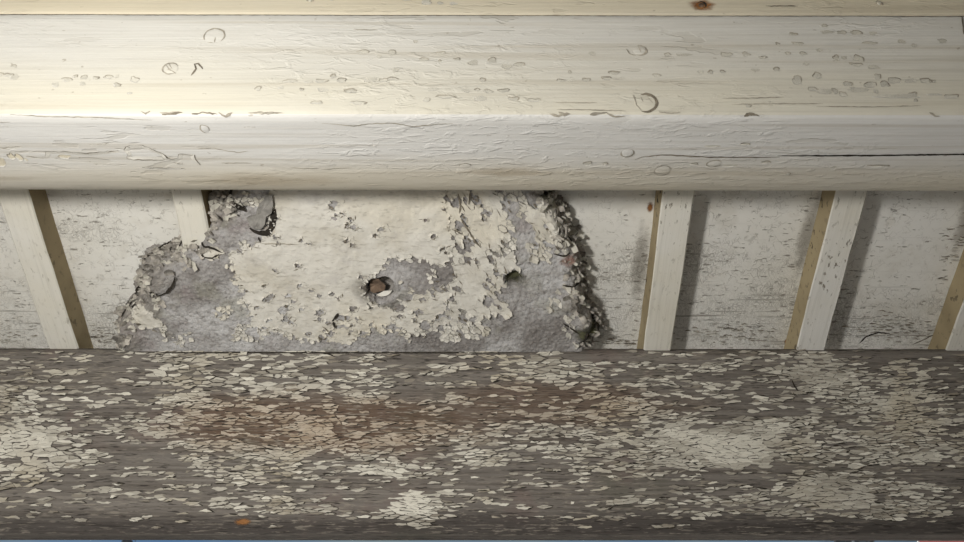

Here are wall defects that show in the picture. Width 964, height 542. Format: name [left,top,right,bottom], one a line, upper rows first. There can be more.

crack [0,14,256,43]
crack [303,15,676,30]
crack [877,16,964,34]
crack [626,45,647,56]
crack [162,62,203,75]
crack [555,93,658,113]
crack [725,97,917,107]
crack [2,114,140,123]
crack [323,121,453,129]
crack [199,125,246,164]
crack [620,149,964,176]
peeling [0,190,964,529]